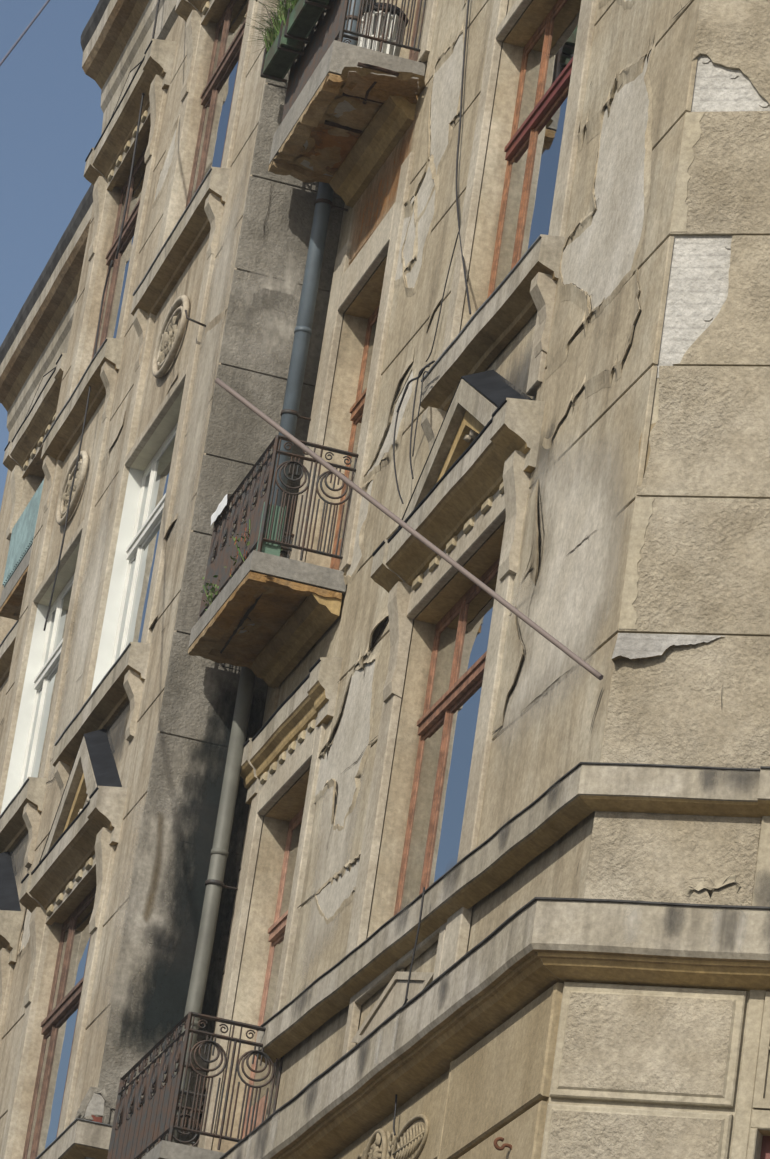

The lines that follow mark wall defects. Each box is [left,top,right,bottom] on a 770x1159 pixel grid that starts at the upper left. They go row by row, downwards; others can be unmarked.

flaking render [339,27,467,297]
flaking render [560,43,656,323]
crack [541,0,691,454]
leakage [246,693,265,741]
leakage [121,689,237,1051]
leakage [198,776,249,1036]